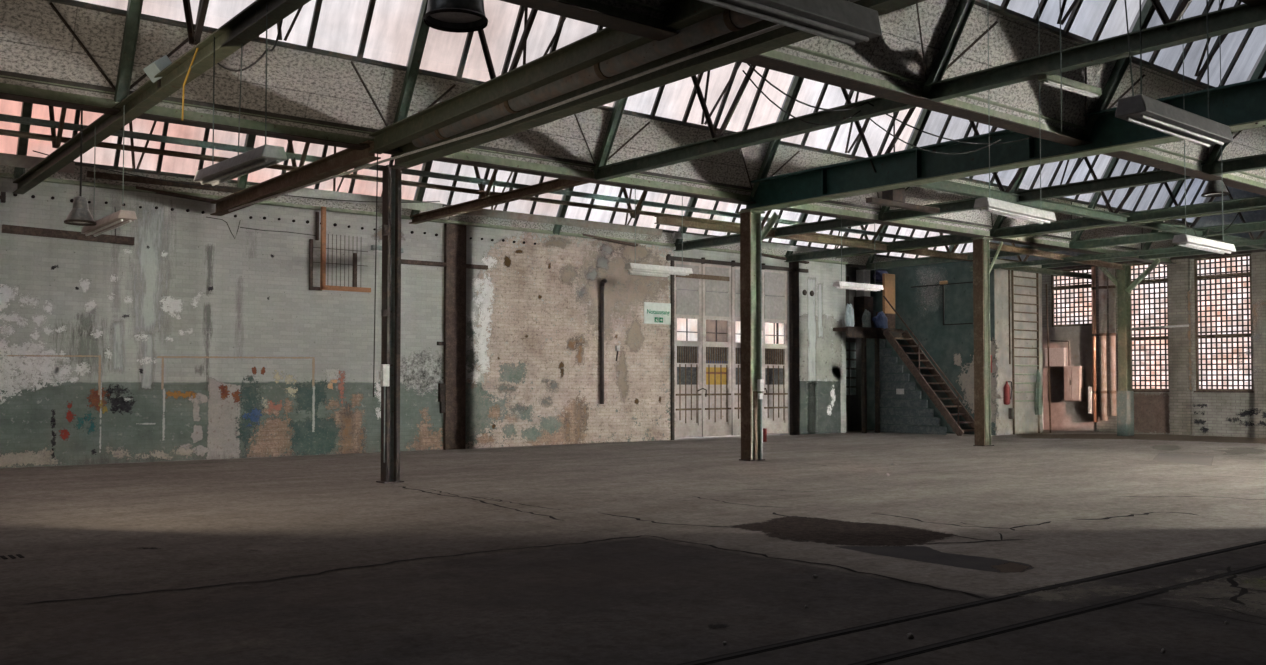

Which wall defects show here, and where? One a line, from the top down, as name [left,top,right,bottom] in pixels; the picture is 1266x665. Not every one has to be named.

peeling [0,283,91,404]
peeling [79,274,133,314]
peeling [159,291,201,342]
peeling [465,232,674,449]
peeling [400,349,444,451]
crack [400,486,565,521]
crack [602,464,986,599]
crack [863,488,1266,544]
crack [1138,566,1266,625]